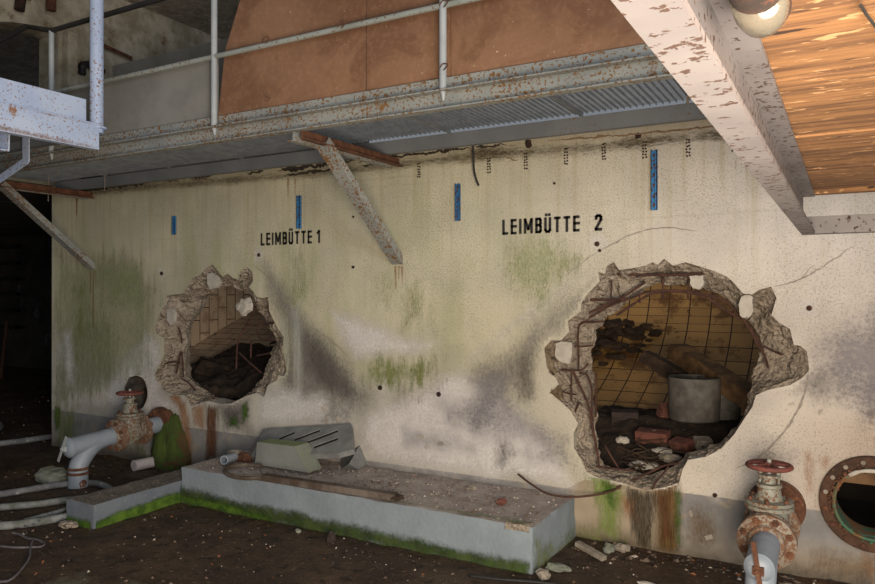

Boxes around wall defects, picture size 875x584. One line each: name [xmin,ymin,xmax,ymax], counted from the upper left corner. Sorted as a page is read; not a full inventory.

crack [566,227,693,275]
crack [779,245,856,286]
spalling [125,376,148,410]
damp [107,335,176,409]
corrosion [171,395,246,459]
spalling [154,264,287,406]
damp [261,277,361,421]
damp [337,316,420,357]
damp [364,336,567,483]
spalling [544,259,809,490]
crack [736,369,809,469]
corrosion [624,485,680,552]